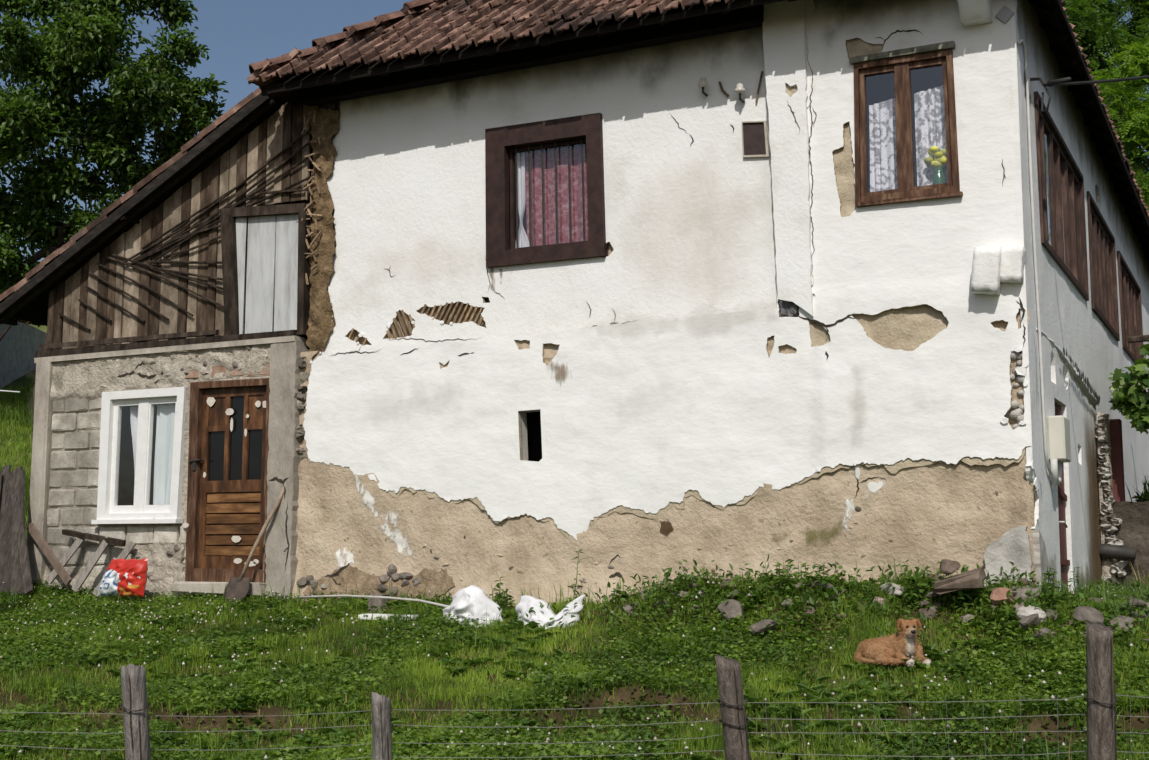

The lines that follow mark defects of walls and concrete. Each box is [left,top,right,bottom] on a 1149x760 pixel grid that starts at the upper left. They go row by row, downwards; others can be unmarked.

crack [878,29,923,49]
peeling [833,123,857,217]
crack [788,40,855,359]
peeling [515,340,530,349]
peeling [768,336,797,355]
peeling [809,322,831,347]
peeling [852,305,949,351]
spalling [292,344,1039,607]